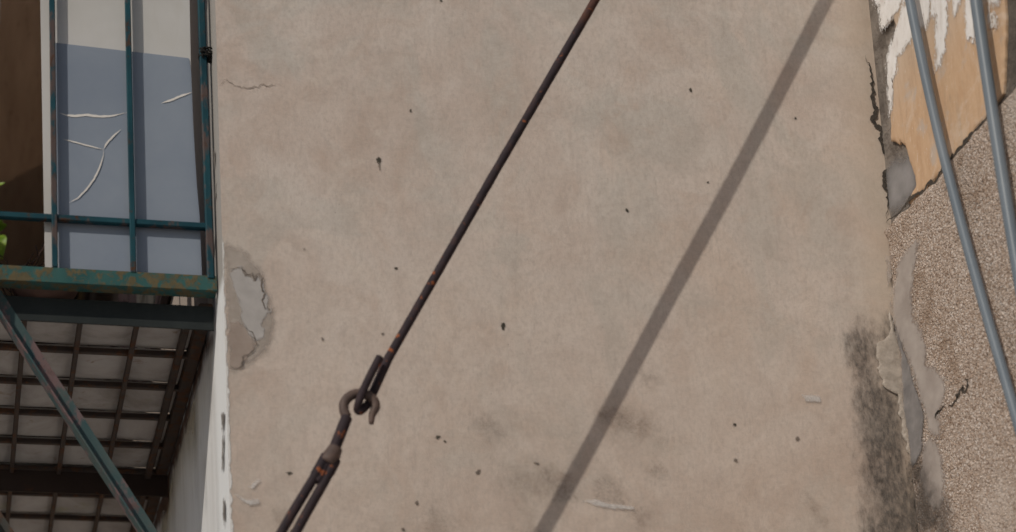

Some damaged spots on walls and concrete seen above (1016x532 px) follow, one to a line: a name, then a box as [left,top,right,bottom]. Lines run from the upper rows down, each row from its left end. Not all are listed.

peeling [872,0,975,115]
spalling [986,0,1016,85]
spalling [225,246,273,369]
spalling [876,311,911,464]
damp [848,329,947,532]